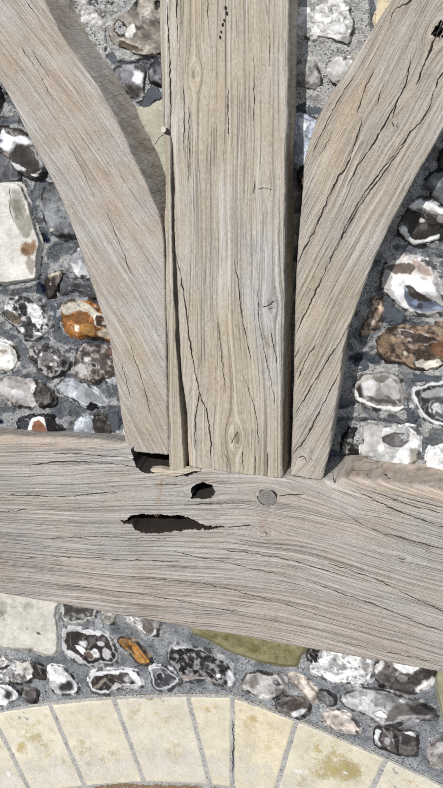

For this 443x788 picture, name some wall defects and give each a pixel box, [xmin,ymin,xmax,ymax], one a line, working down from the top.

crack [154,0,268,473]
crack [234,21,443,453]
crack [20,536,443,631]